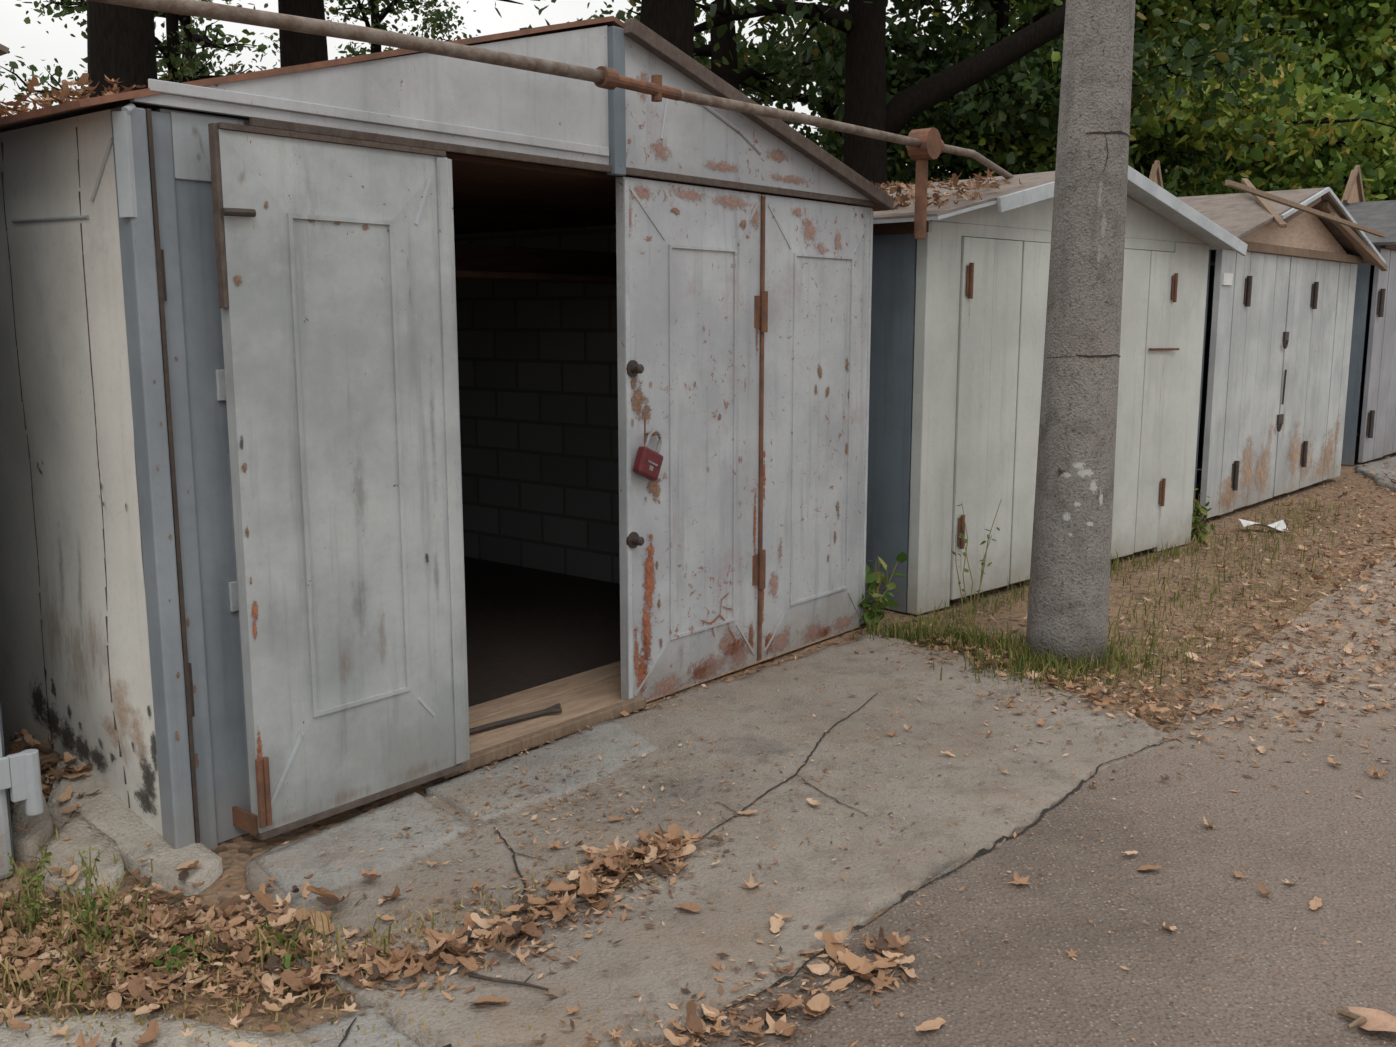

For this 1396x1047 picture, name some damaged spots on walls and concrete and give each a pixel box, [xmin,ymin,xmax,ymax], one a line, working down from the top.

peeling [629,186,650,226]
peeling [670,188,759,230]
peeling [706,161,738,171]
peeling [767,151,804,184]
peeling [793,208,842,254]
corrosion [1289,424,1339,476]
corrosion [634,534,854,699]
damp [29,666,115,773]
damp [131,706,157,814]
crack [702,692,878,837]
crack [852,739,1174,930]
crack [681,948,826,1033]